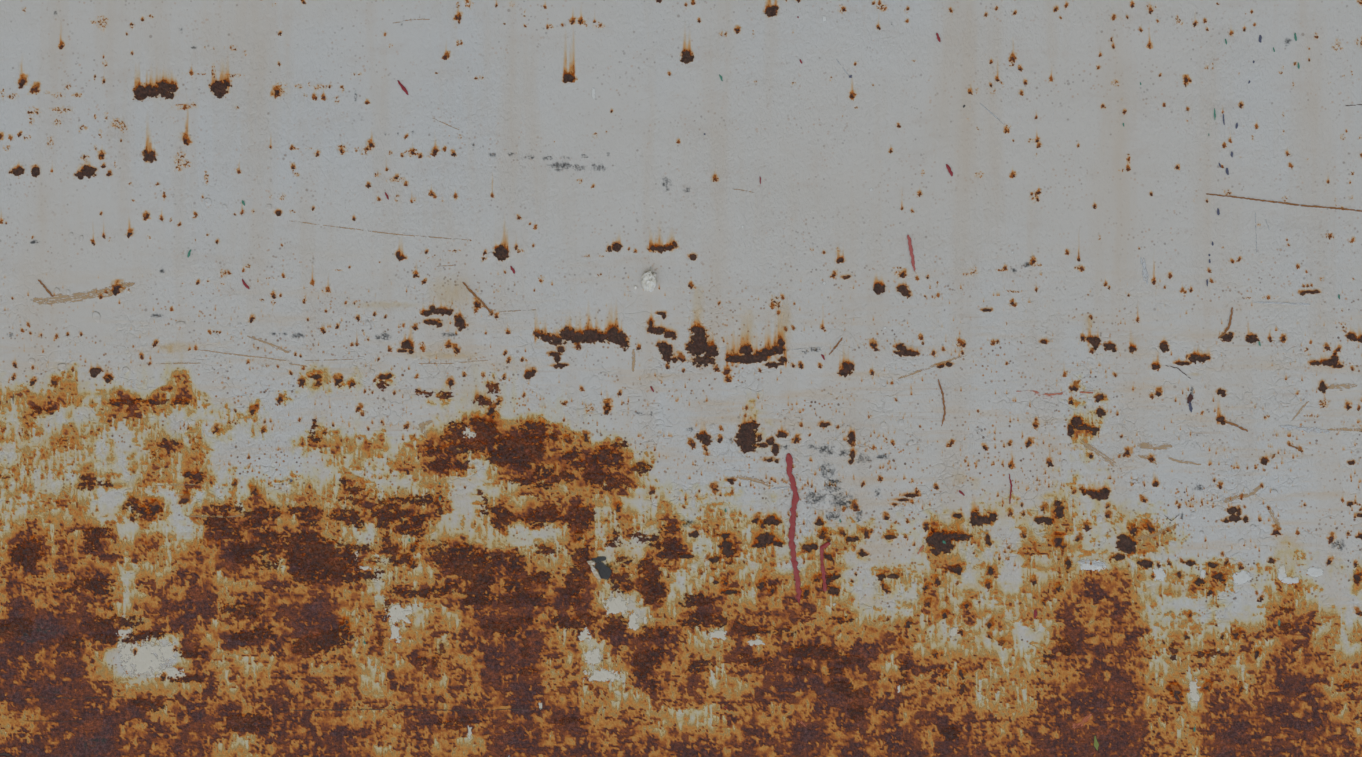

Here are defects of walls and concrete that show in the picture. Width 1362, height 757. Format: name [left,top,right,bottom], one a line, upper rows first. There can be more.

rust [345,302,457,359]